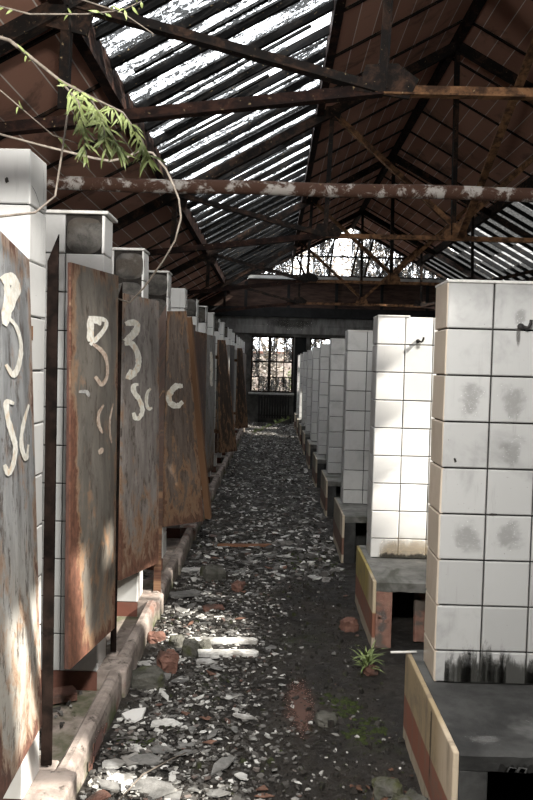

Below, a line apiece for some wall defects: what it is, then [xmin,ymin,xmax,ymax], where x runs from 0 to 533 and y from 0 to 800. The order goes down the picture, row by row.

mould [444,651,533,684]